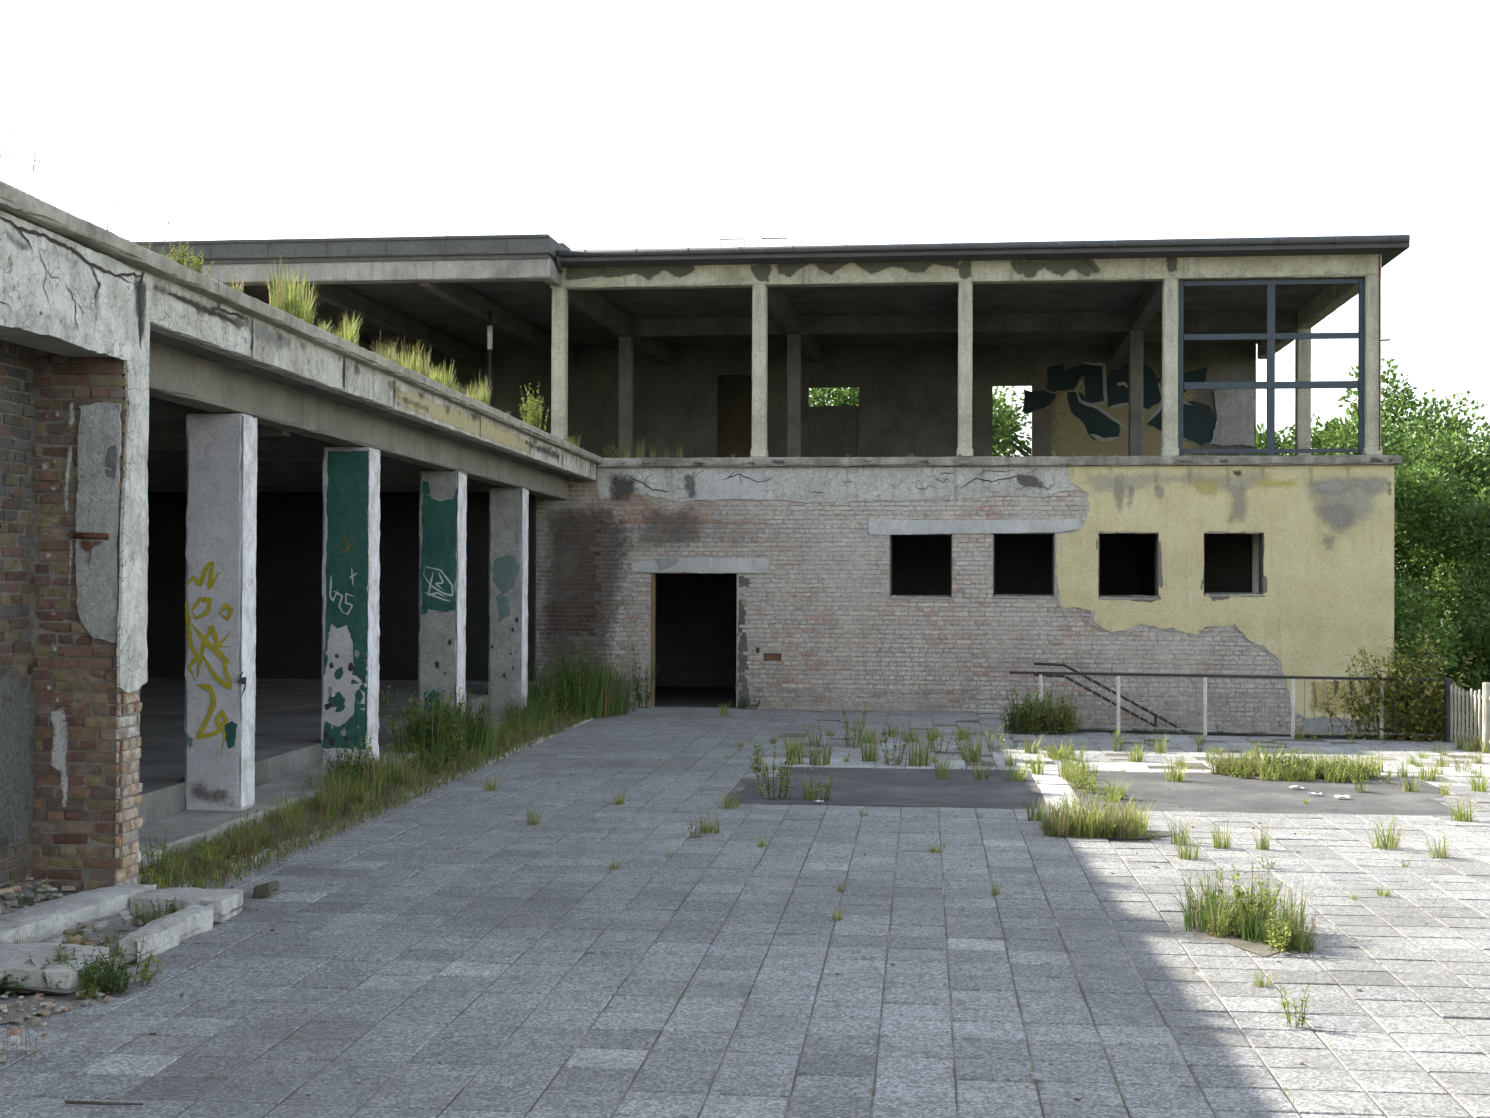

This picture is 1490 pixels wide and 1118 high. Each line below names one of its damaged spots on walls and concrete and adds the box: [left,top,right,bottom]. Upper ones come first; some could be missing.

crack [0,216,254,357]
peeling [323,451,369,750]
peeling [420,481,458,674]
flaking render [1017,474,1043,487]
leakage [1096,471,1257,521]
leakage [1313,479,1391,547]